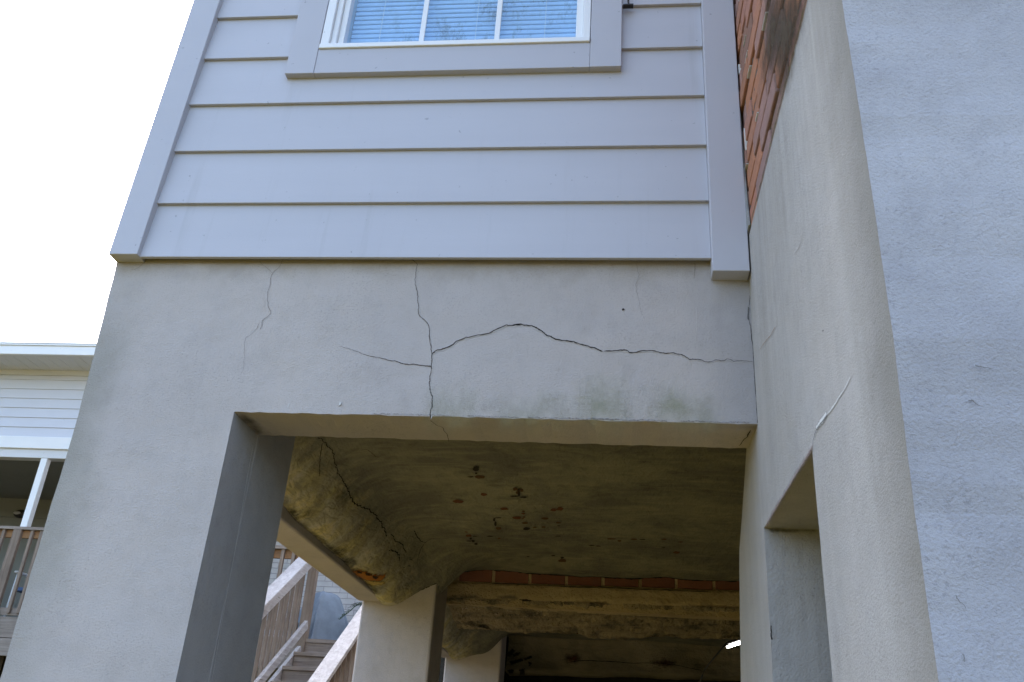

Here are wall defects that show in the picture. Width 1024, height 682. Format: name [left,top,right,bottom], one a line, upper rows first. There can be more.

crack [341,260,758,441]
crack [318,438,434,568]